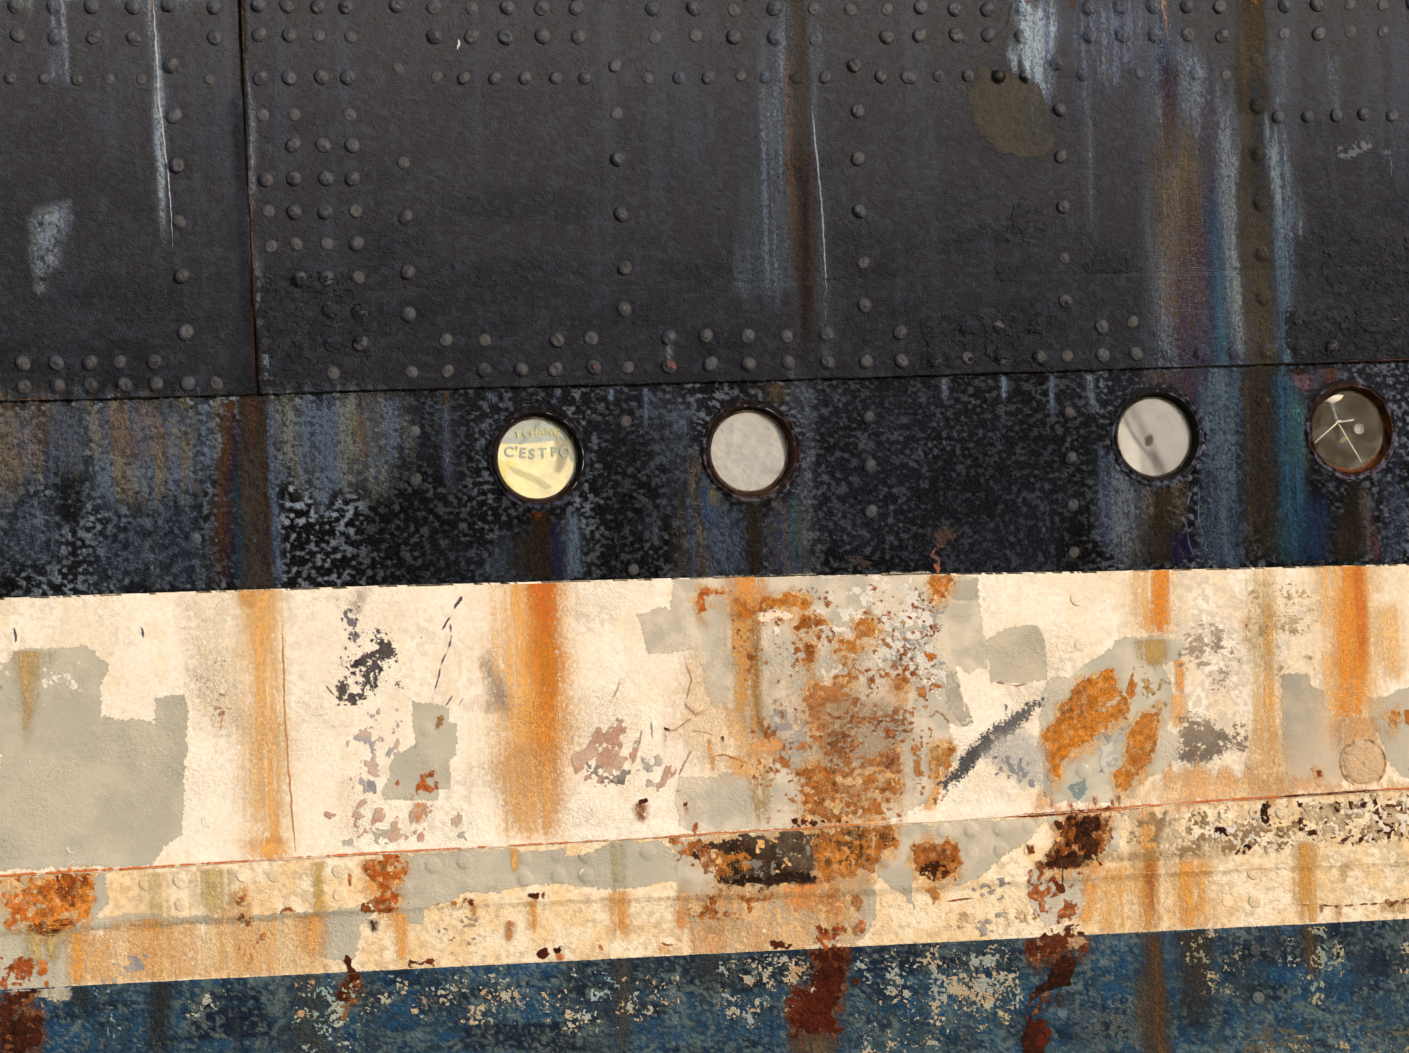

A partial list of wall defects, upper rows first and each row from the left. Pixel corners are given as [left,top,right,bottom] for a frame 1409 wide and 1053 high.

leakage [31,204,70,291]
leakage [738,0,832,362]
leakage [997,0,1057,157]
leakage [1074,0,1343,568]
peeling [38,662,82,693]
leakage [0,386,222,588]
rust [0,0,491,1053]
rust [482,504,963,1053]
leakage [643,371,813,576]
rust [1009,481,1409,1053]